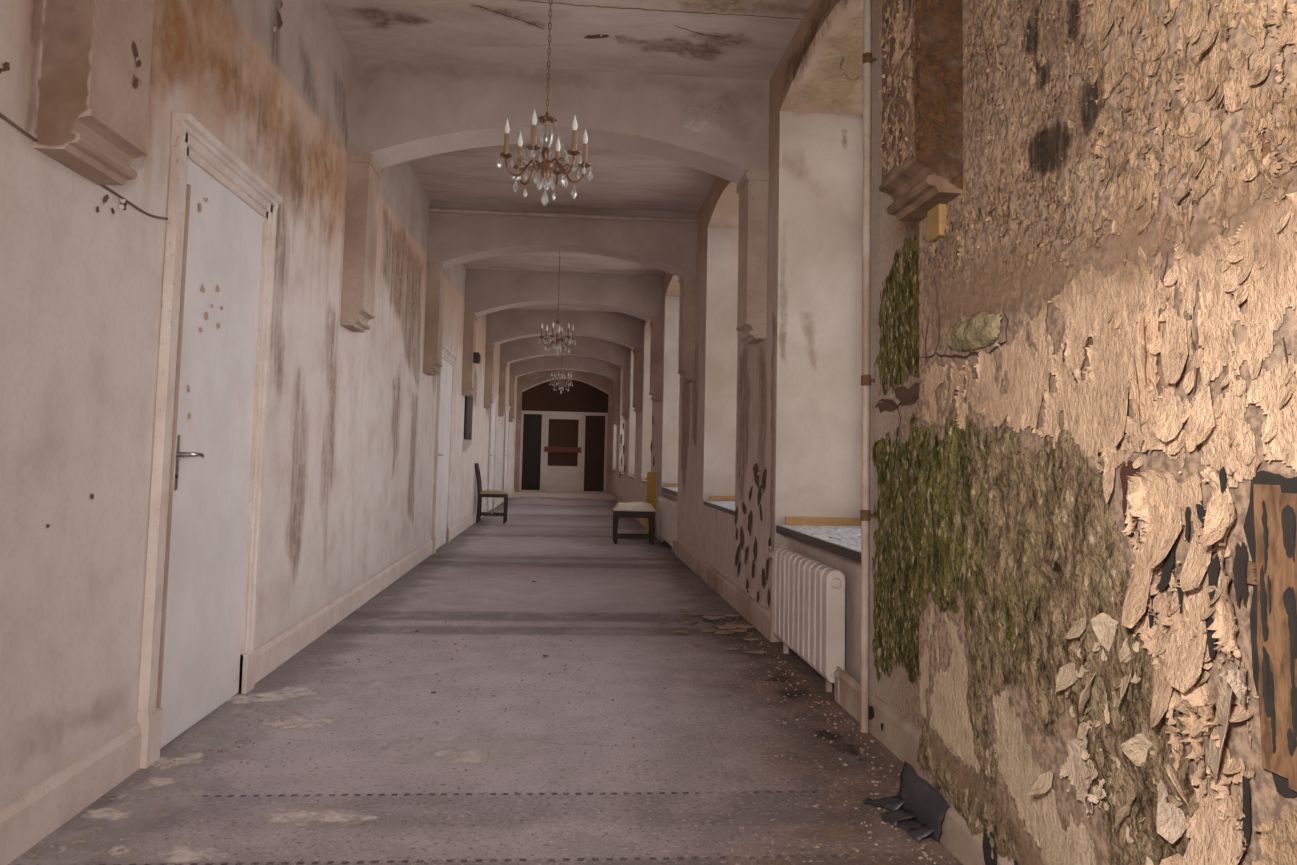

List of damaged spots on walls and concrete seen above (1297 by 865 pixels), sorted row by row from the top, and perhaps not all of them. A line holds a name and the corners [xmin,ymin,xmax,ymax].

leakage [1025,9,1049,86]
leakage [1068,1,1079,40]
leakage [1082,80,1103,130]
leakage [1029,119,1069,174]
peeling [874,0,1297,865]
peeling [734,463,771,607]